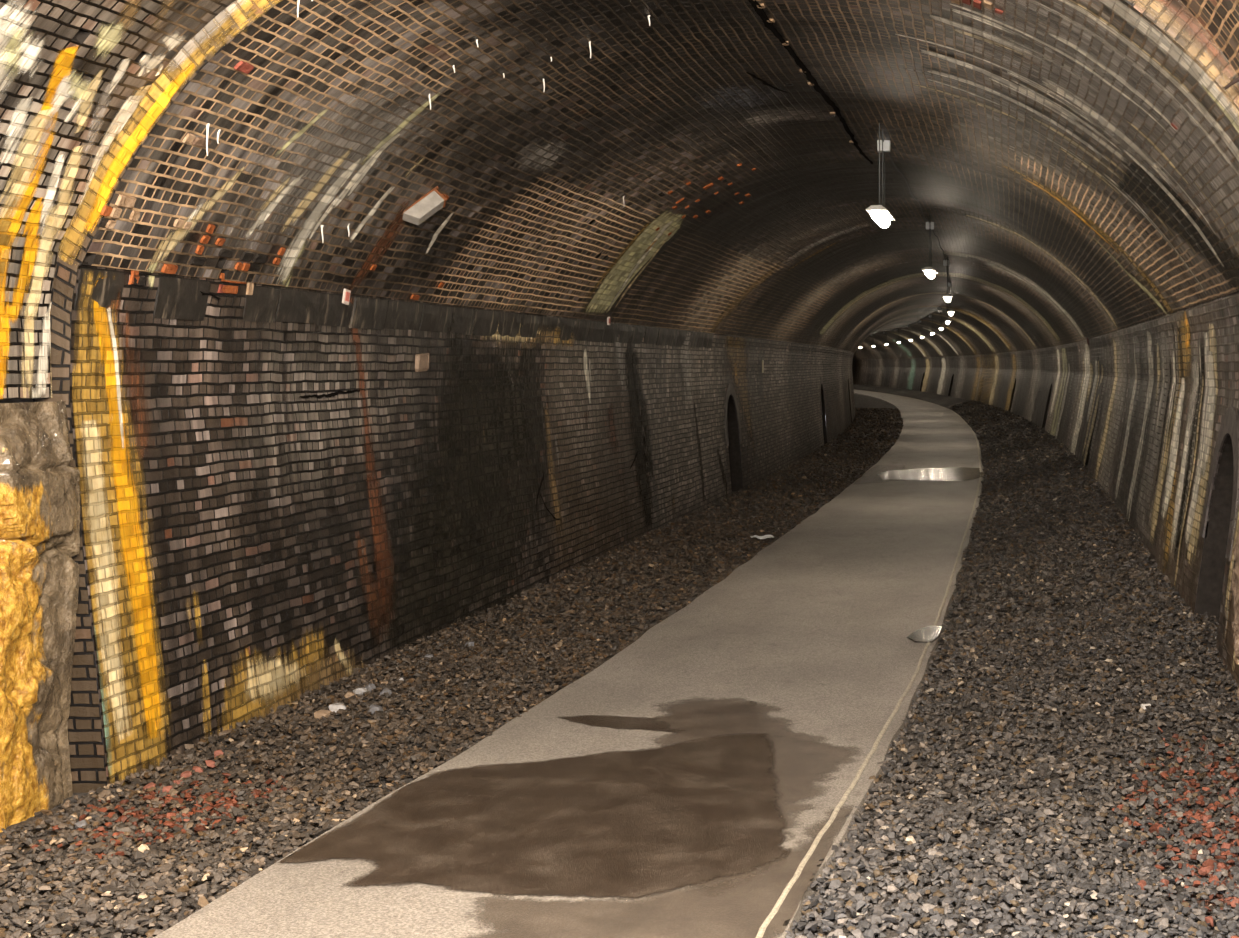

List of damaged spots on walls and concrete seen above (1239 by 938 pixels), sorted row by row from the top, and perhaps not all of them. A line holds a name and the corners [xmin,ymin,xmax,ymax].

crack [746,0,873,164]
spalling [101,194,140,230]
spalling [173,219,192,230]
spalling [161,224,286,295]
spalling [128,270,146,286]
crack [300,390,360,399]
water stain [376,319,597,655]